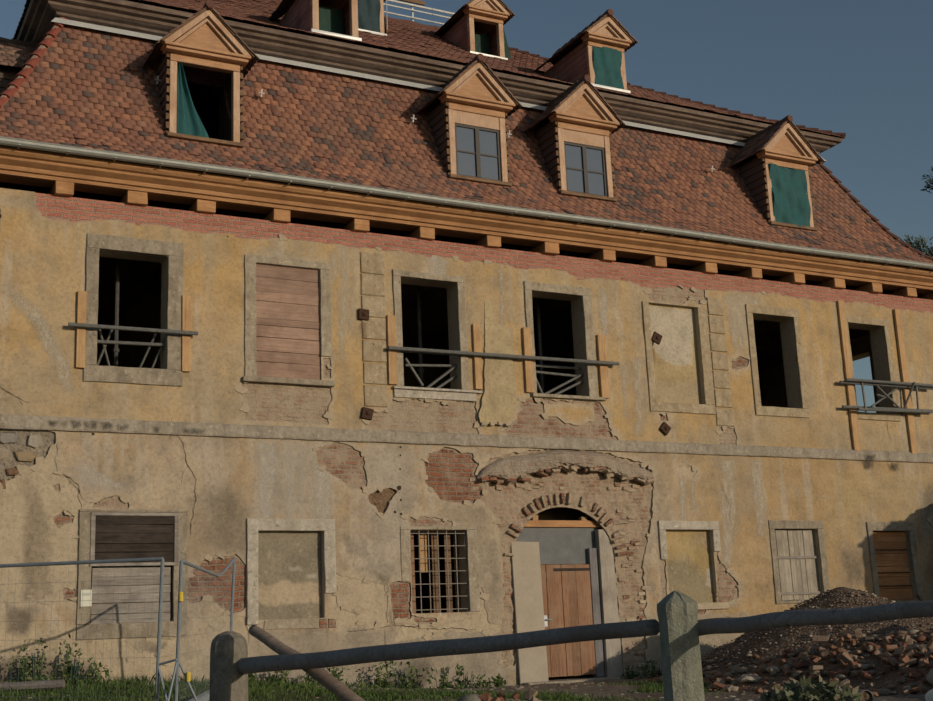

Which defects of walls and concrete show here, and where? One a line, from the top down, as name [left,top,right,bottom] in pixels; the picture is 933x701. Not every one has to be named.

flaking render [362,397,483,434]
flaking render [503,397,619,440]
flaking render [0,429,82,605]
flaking render [116,554,249,667]
crack [168,419,199,535]
flaking render [313,442,396,518]
flaking render [388,447,654,642]
flaking render [714,557,740,602]
flaking render [497,649,516,668]
flaking render [621,636,648,673]